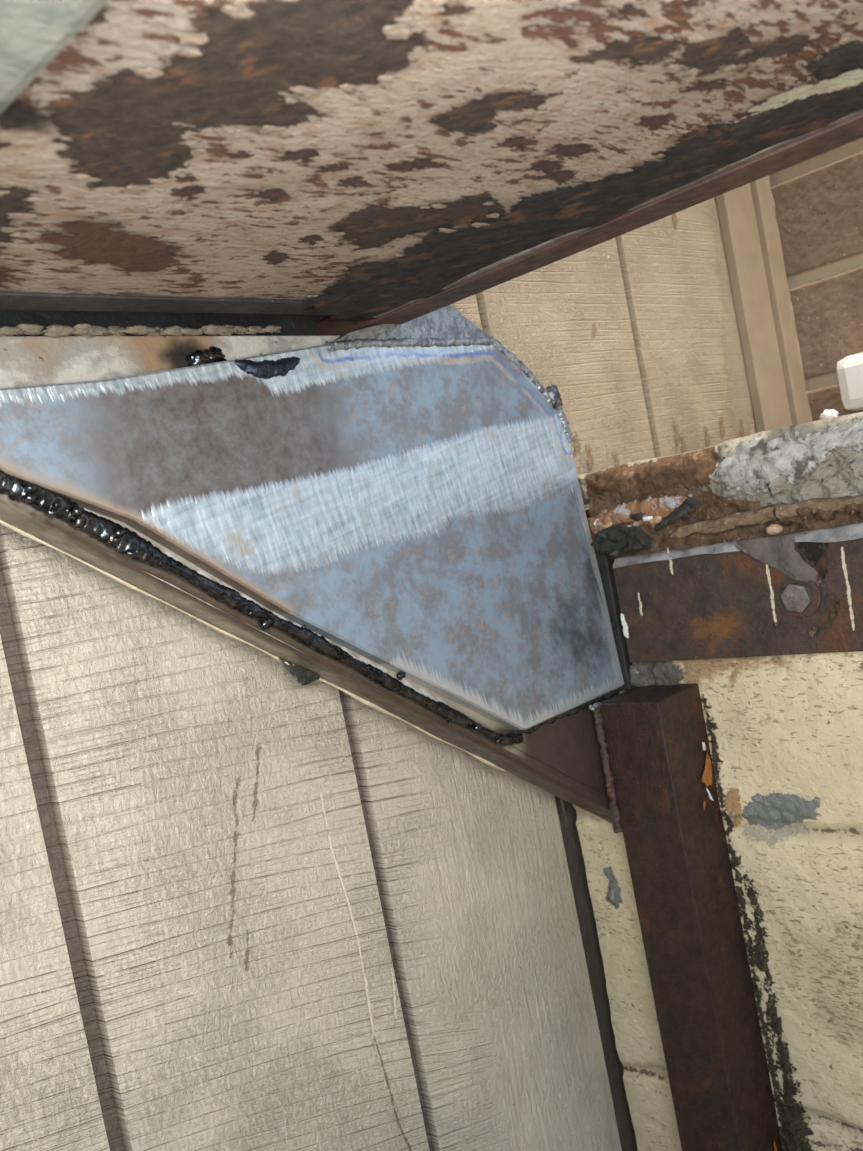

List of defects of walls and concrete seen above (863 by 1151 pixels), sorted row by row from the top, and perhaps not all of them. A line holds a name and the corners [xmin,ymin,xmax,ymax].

corrosion [605,3,647,21]
corrosion [667,0,706,11]
corrosion [22,0,475,203]
peeling [731,68,863,123]
corrosion [297,27,863,321]
corrosion [0,184,51,249]
corrosion [38,221,196,276]
corrosion [260,251,293,266]
spalling [586,416,863,534]
corrosion [701,752,713,786]
crack [374,1037,412,1151]